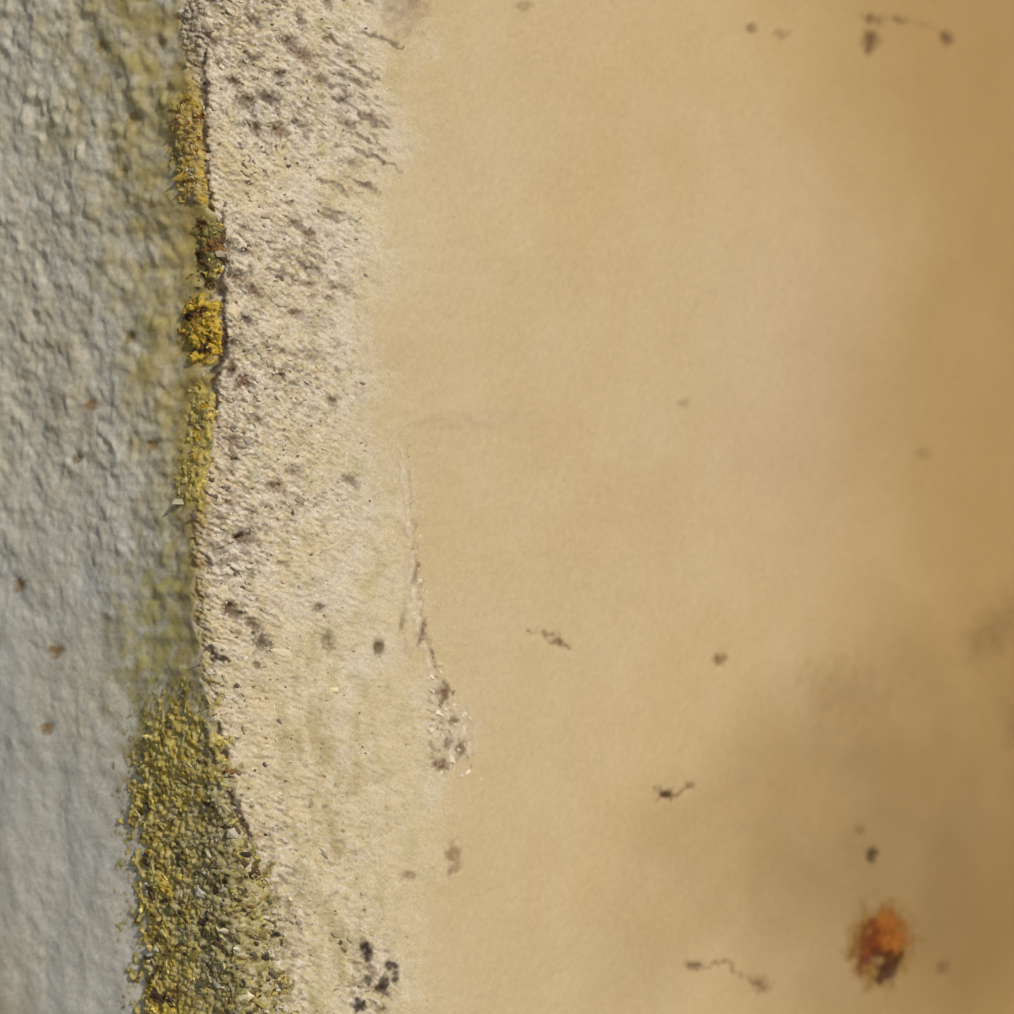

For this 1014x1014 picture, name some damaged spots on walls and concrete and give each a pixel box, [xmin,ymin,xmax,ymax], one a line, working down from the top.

damp [112,0,196,156]
damp [130,289,179,386]
spalling [159,0,517,1014]
rust [849,905,909,984]